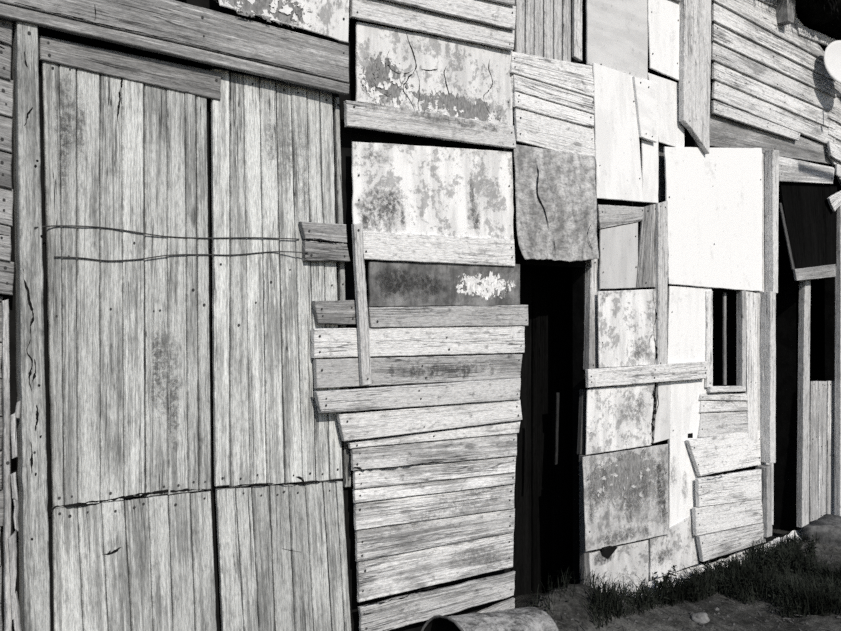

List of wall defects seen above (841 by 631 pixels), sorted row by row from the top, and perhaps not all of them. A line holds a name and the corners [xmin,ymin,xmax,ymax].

peeling [222,0,318,28]
crack [387,33,450,110]
peeling [358,51,503,124]
peeling [456,271,516,301]
crack [23,269,39,471]
crack [47,459,462,510]
peeling [584,444,666,509]